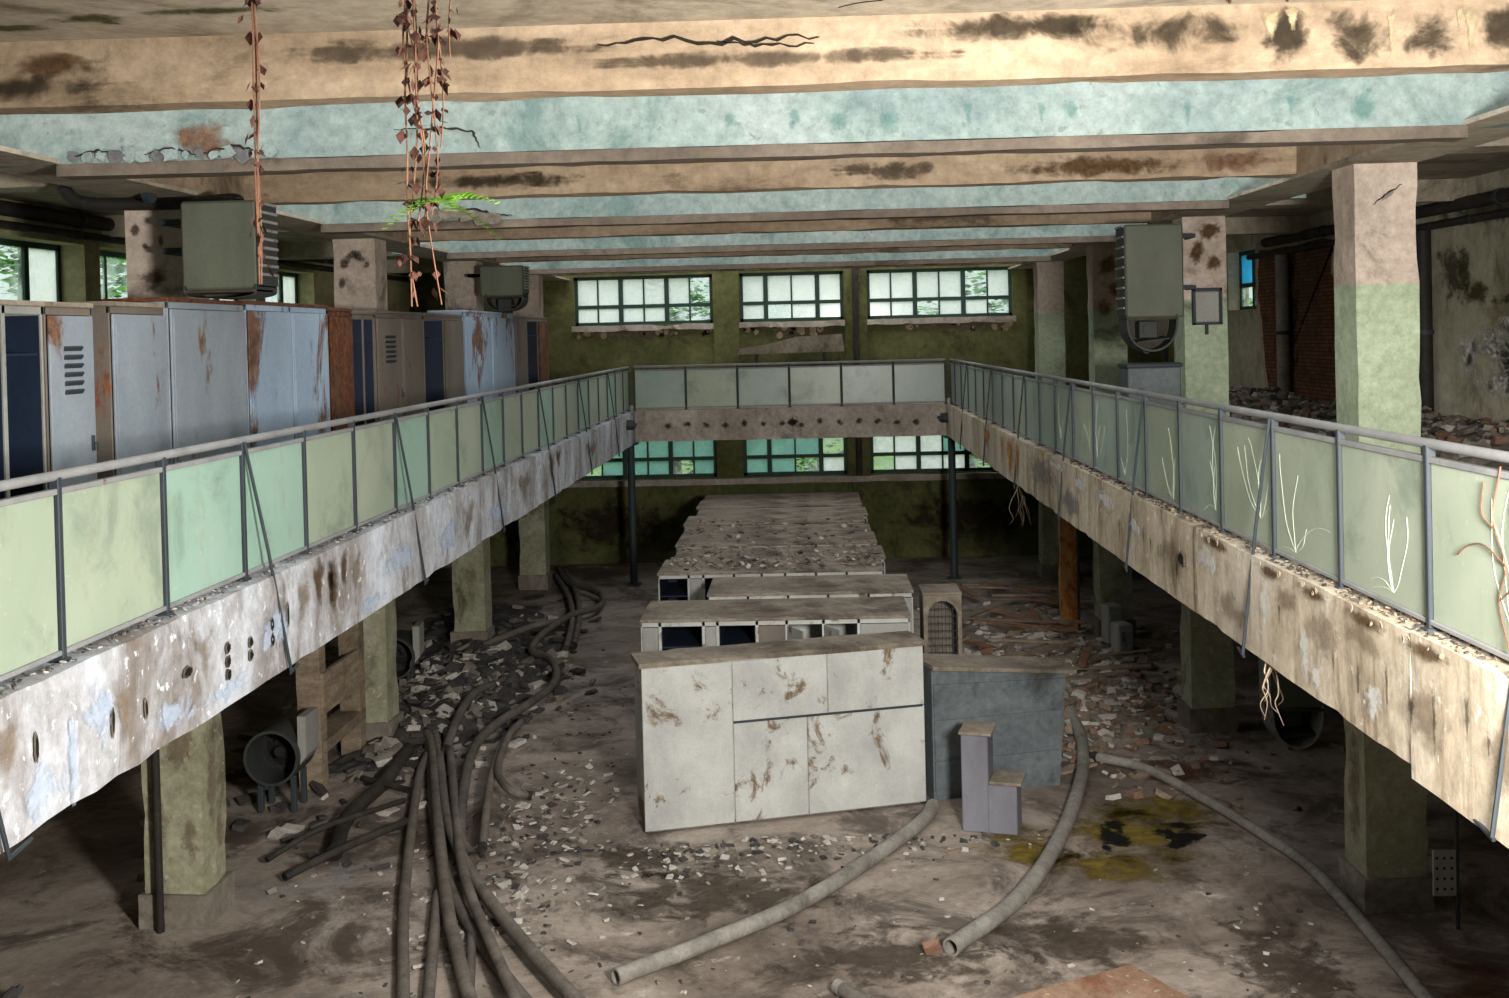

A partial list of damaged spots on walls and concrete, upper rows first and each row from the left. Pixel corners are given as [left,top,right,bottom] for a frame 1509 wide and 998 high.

leakage [313,36,569,64]
crack [598,0,883,48]
leakage [592,45,928,68]
leakage [951,14,1095,54]
leakage [1133,16,1234,49]
leakage [1263,8,1306,57]
leakage [1331,9,1509,63]
leakage [0,54,98,101]
flaking render [68,144,277,164]
leakage [411,171,562,189]
leakage [1022,157,1176,177]
flaking render [428,205,512,226]